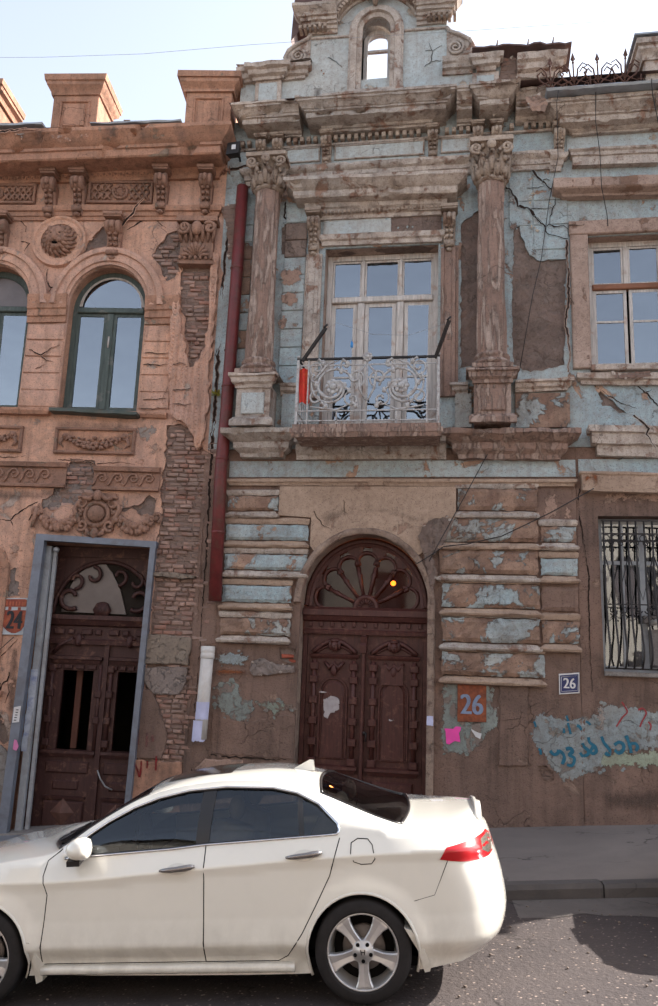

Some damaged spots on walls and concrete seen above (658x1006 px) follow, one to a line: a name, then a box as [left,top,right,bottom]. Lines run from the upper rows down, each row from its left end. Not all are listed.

spalling [150,230,210,367]
peeling [276,265,305,329]
spalling [507,196,568,374]
crack [505,170,585,372]
crack [29,344,60,369]
crack [594,385,658,460]
peeling [544,491,572,519]
spalling [121,423,219,773]
peeling [215,650,254,667]
peeling [212,678,296,722]
peeling [529,701,658,783]